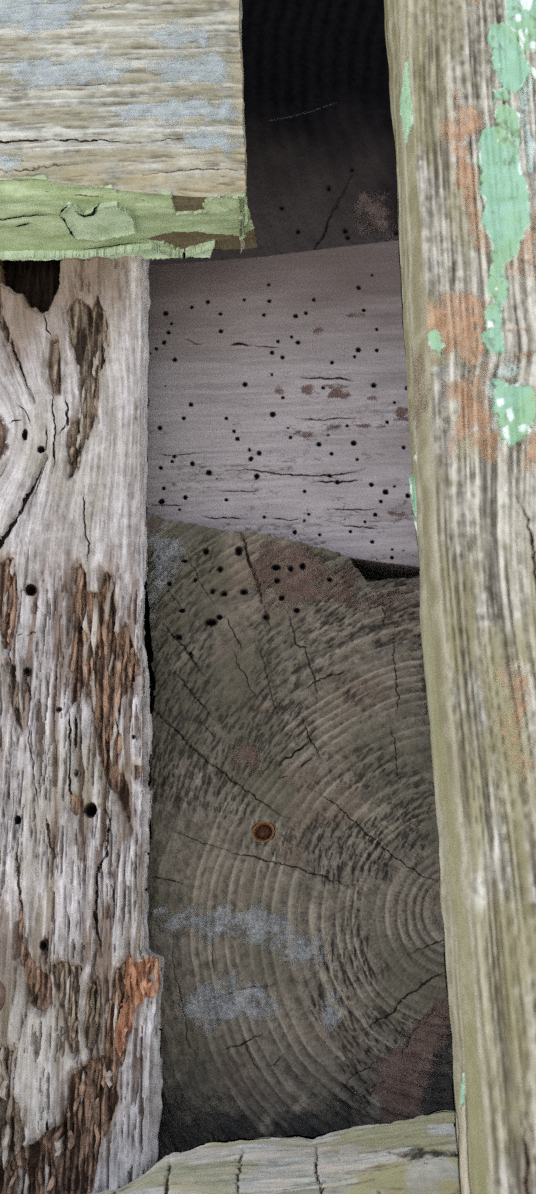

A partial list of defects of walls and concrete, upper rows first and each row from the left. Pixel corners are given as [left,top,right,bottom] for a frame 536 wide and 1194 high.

peeling [400,60,413,146]
peeling [0,175,254,262]
crack [314,179,350,250]
peeling [477,0,536,355]
spalling [0,282,13,343]
peeling [489,365,536,448]
crack [315,1148,324,1194]